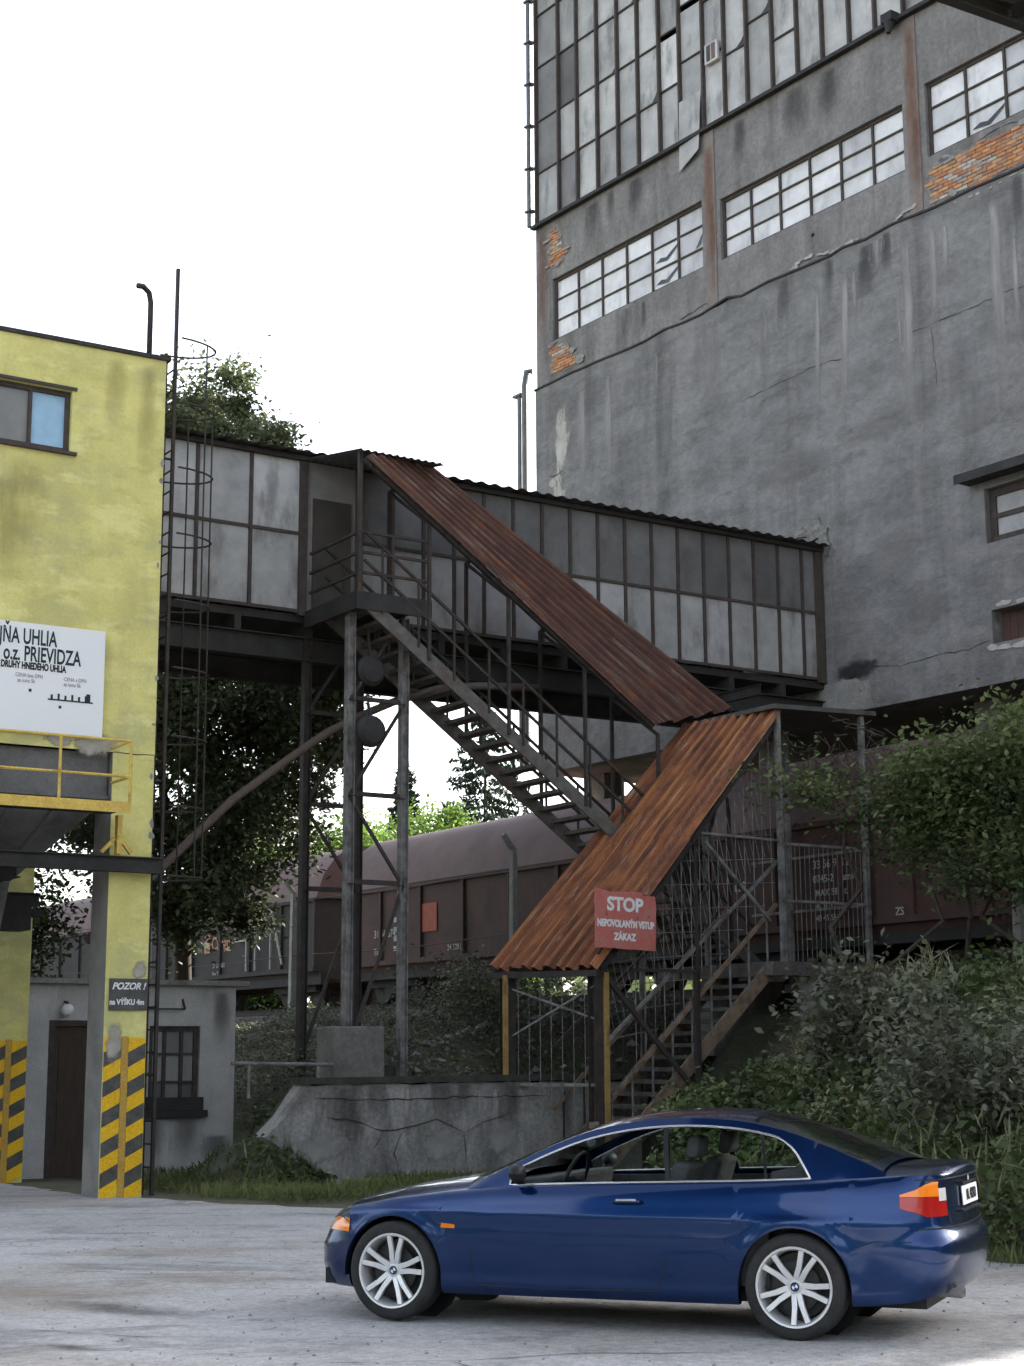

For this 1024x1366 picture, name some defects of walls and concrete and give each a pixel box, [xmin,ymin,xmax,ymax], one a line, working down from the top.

flaking render [891,118,1024,223]
flaking render [543,223,570,269]
flaking render [547,340,585,376]
water stain [841,271,856,383]
water stain [897,244,912,371]
water stain [990,204,1019,335]
spalling [987,640,1024,651]
crack [319,1095,543,1166]